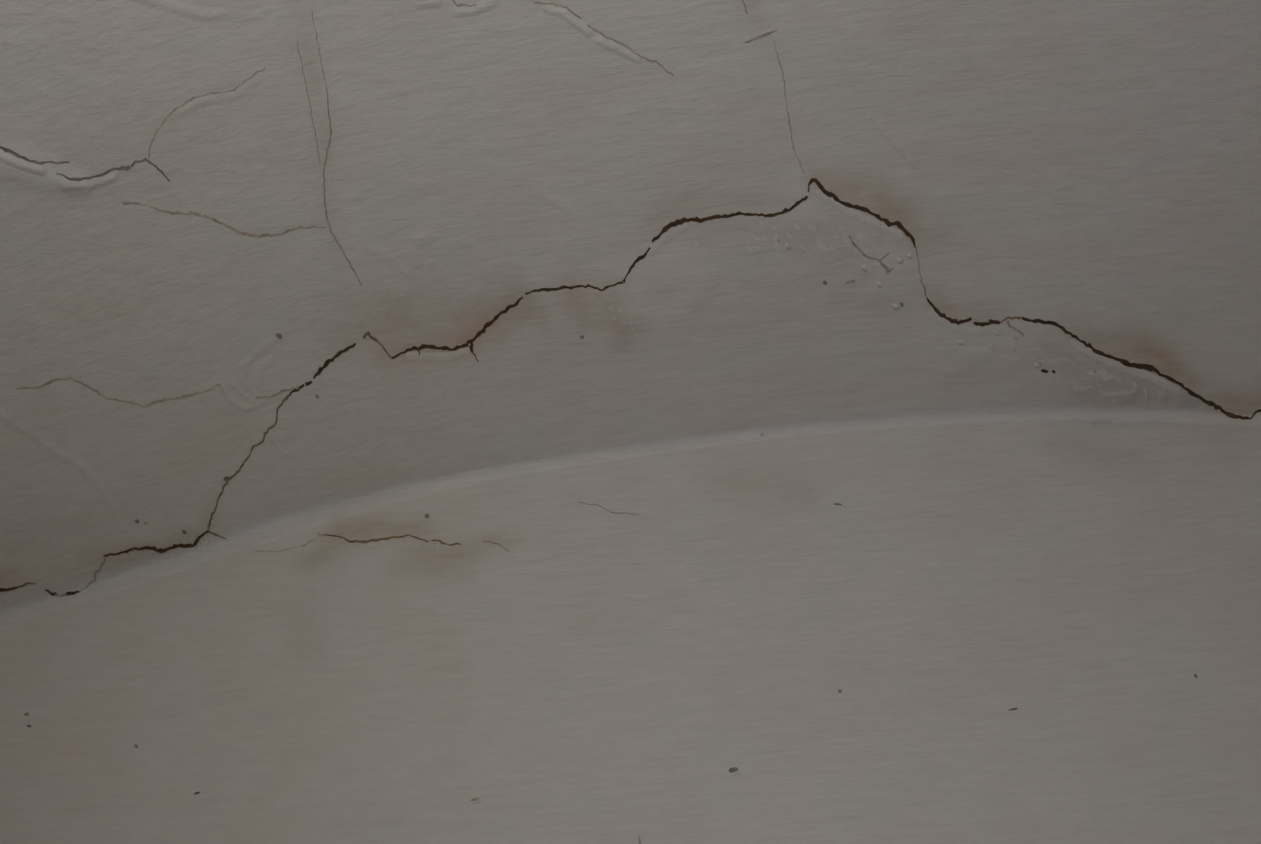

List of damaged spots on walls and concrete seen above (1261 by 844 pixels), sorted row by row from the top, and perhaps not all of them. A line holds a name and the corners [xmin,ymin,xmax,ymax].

crack [0,0,1261,597]